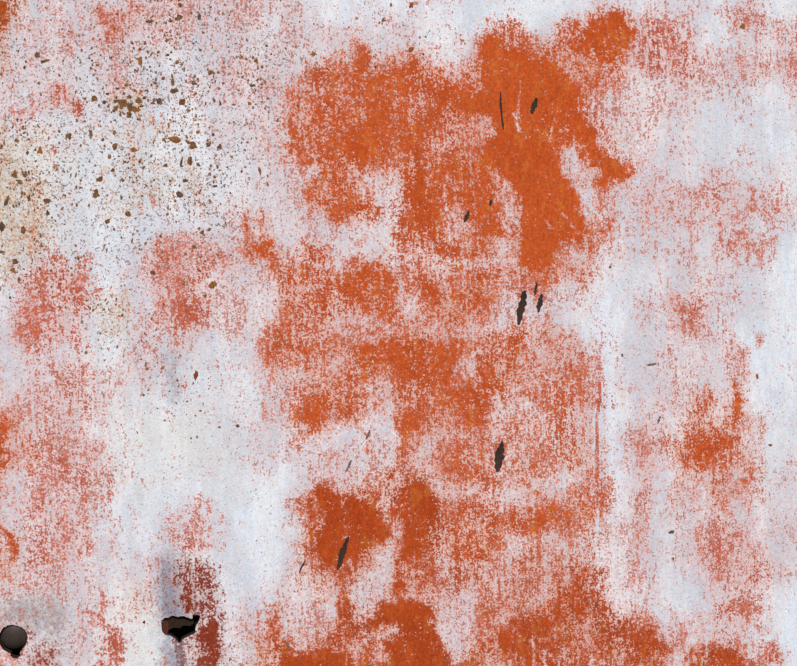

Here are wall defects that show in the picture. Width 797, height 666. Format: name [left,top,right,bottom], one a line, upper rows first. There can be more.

corrosion [0,0,257,302]
corrosion [59,276,171,396]
corrosion [184,0,785,666]
corrosion [0,387,41,589]
water stain [173,638,188,666]